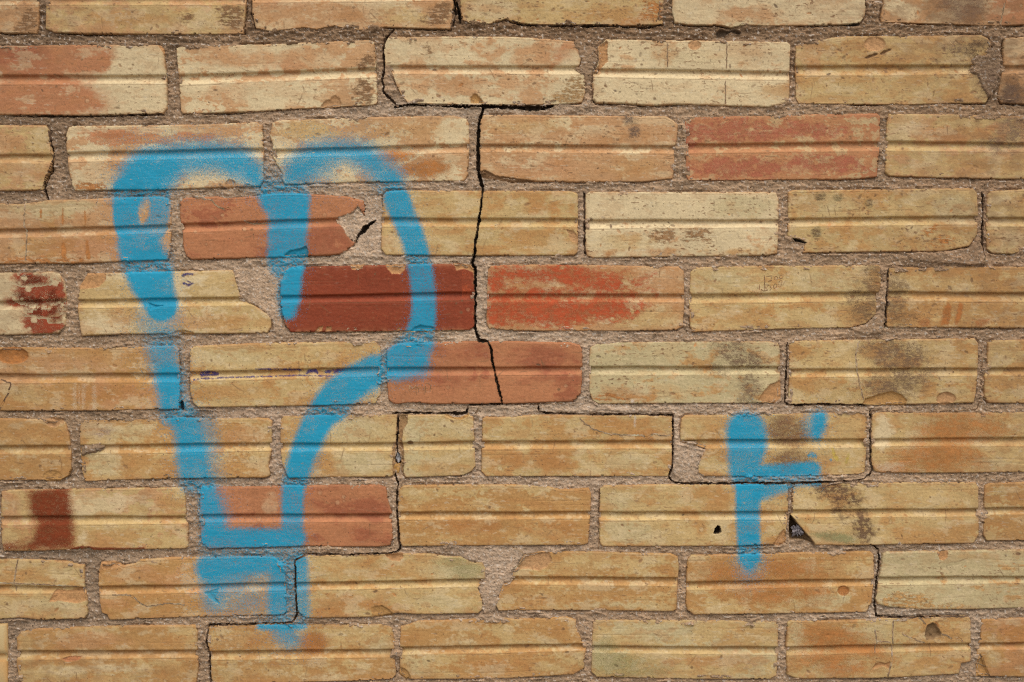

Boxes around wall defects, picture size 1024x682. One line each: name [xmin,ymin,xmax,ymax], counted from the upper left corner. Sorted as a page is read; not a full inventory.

crack [451,0,668,112]
crack [23,30,986,512]
crack [594,489,602,549]
spalling [774,514,815,546]